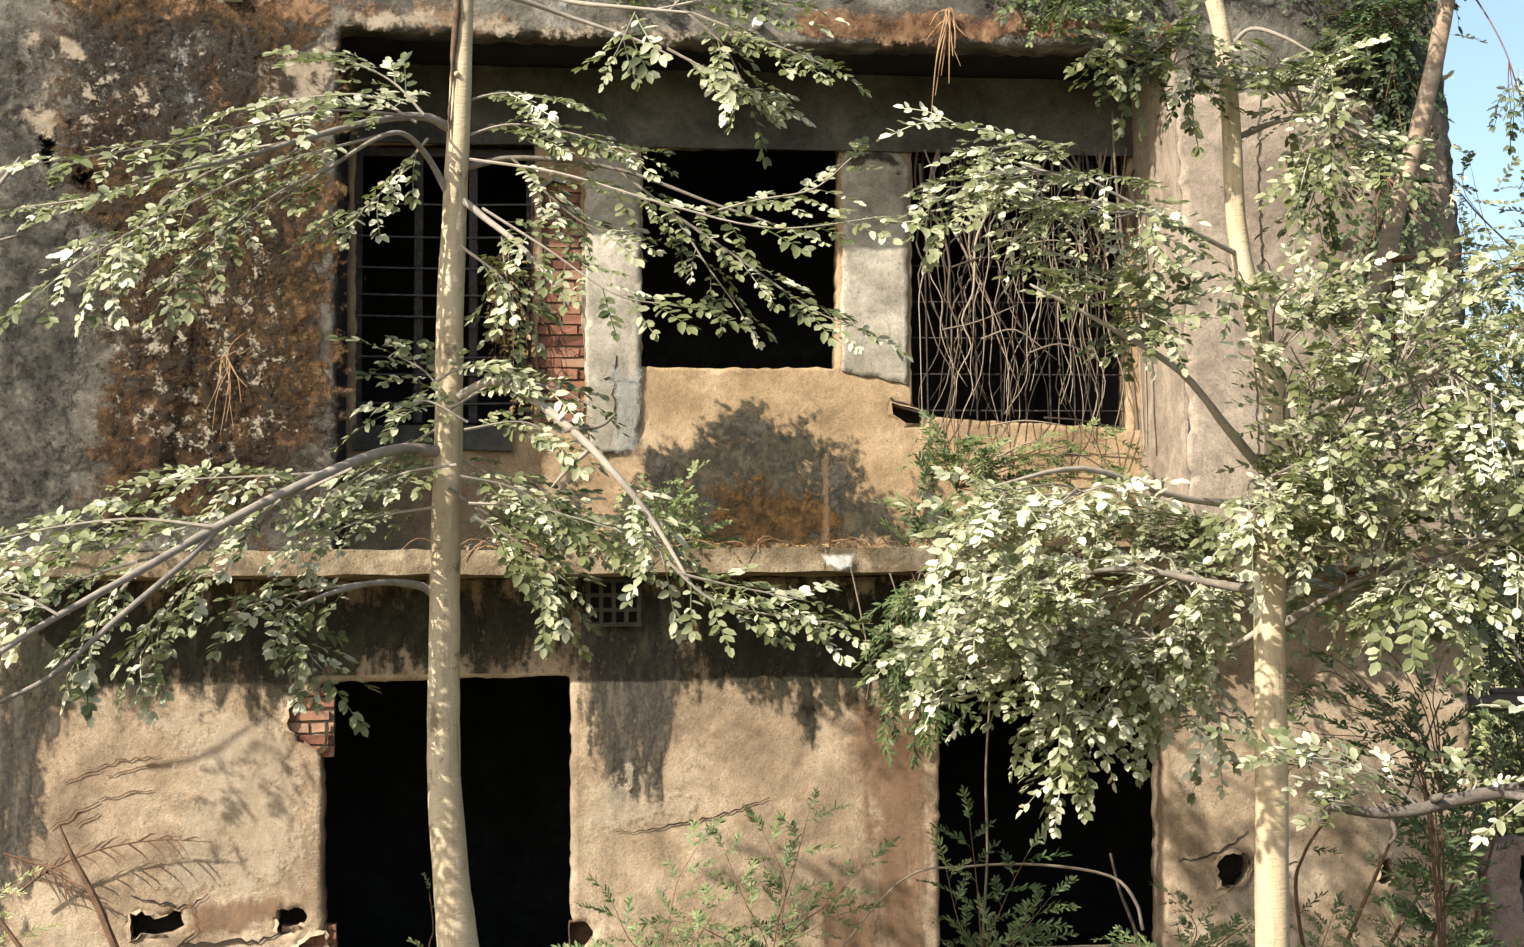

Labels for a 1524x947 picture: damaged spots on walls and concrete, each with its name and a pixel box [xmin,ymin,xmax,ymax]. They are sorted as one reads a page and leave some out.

damp [344,7,453,30]
damp [473,14,519,37]
damp [0,4,353,546]
flaking render [530,176,587,434]
damp [603,368,945,569]
flaking render [281,687,336,757]
damp [571,577,697,819]
damp [0,674,72,947]
crack [616,798,769,833]
spalling [1210,848,1254,893]
spalling [123,907,184,943]
flaking render [273,908,338,947]